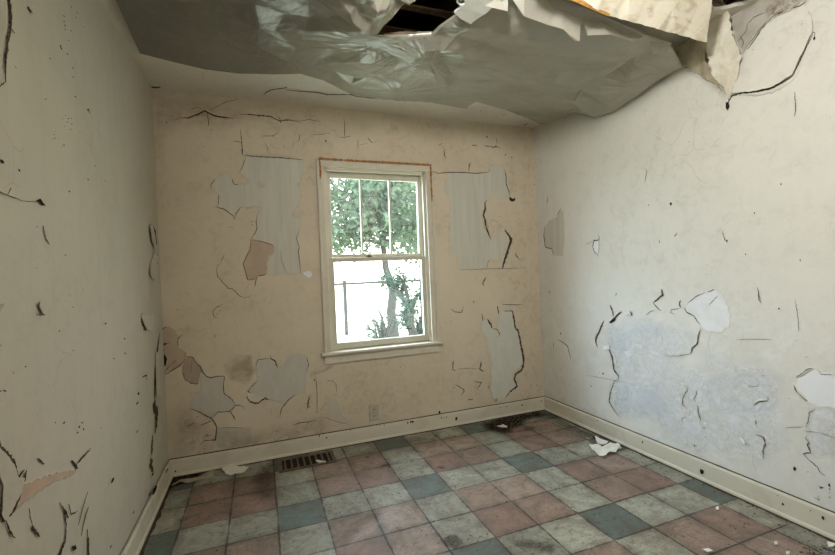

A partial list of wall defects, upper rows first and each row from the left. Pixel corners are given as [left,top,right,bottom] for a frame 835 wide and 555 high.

crack [265,87,375,99]
crack [180,99,373,154]
peeling [242,238,275,284]
peeling [670,288,732,353]
peeling [481,306,525,408]
peeling [792,366,835,453]
peeling [0,443,91,522]
crack [6,509,40,538]
crack [58,492,90,555]